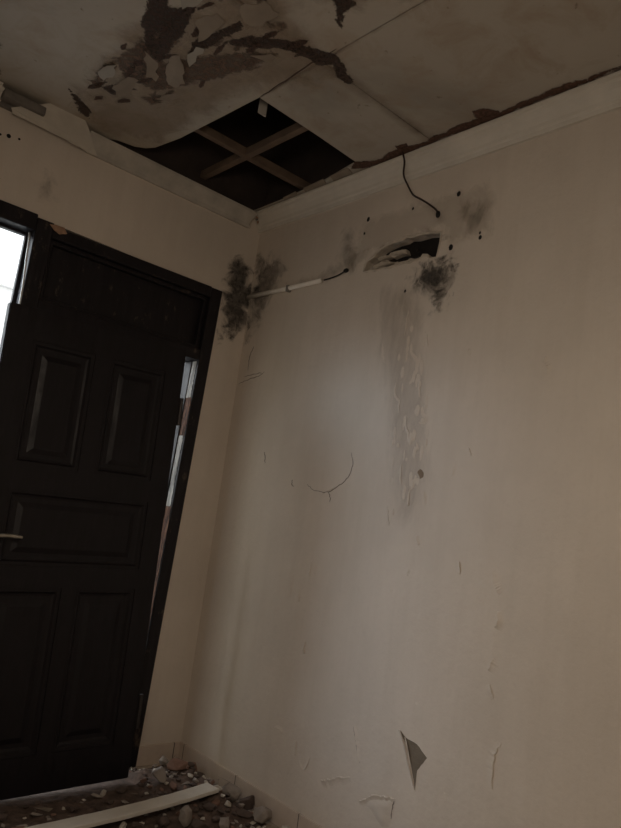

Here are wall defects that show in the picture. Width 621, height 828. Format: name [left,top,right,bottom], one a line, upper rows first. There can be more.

peeling [98,13,224,97]
mould [222,260,275,339]
hole [363,230,443,273]
mould [417,257,455,294]
peeling [398,730,427,790]